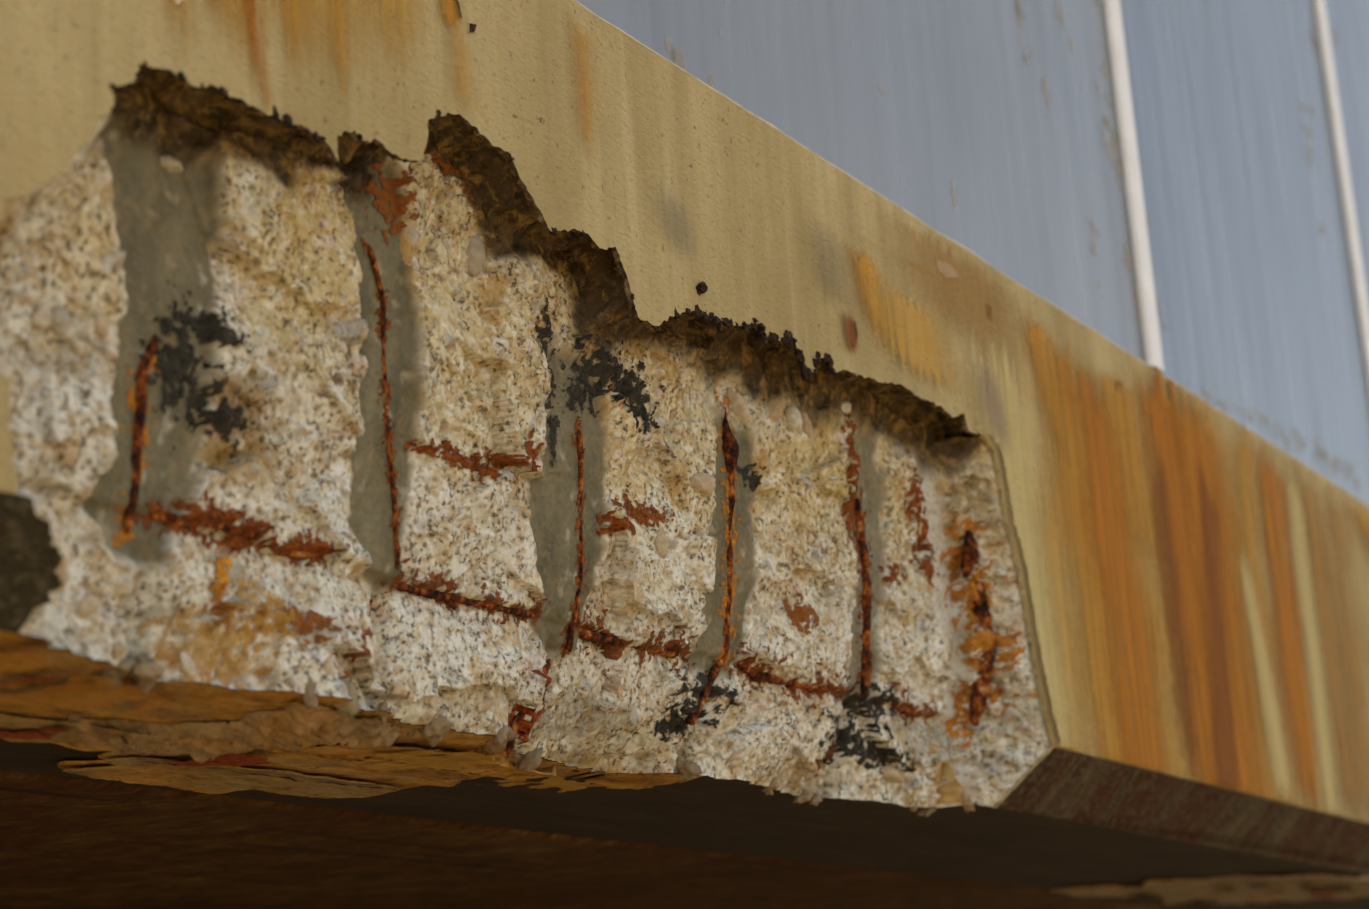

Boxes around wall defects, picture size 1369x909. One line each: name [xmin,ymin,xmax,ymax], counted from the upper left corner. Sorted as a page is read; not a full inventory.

corrosion [356,159,420,244]
corrosion [844,250,951,385]
corrosion [404,429,545,485]
spalling [0,60,1050,817]
corrosion [595,493,691,538]
corrosion [840,397,940,592]
corrosion [1024,314,1290,802]
corrosion [782,589,822,637]
corrosion [508,667,552,745]
corrosion [349,749,652,792]
corrosion [929,738,970,804]
flaking render [1051,874,1369,909]